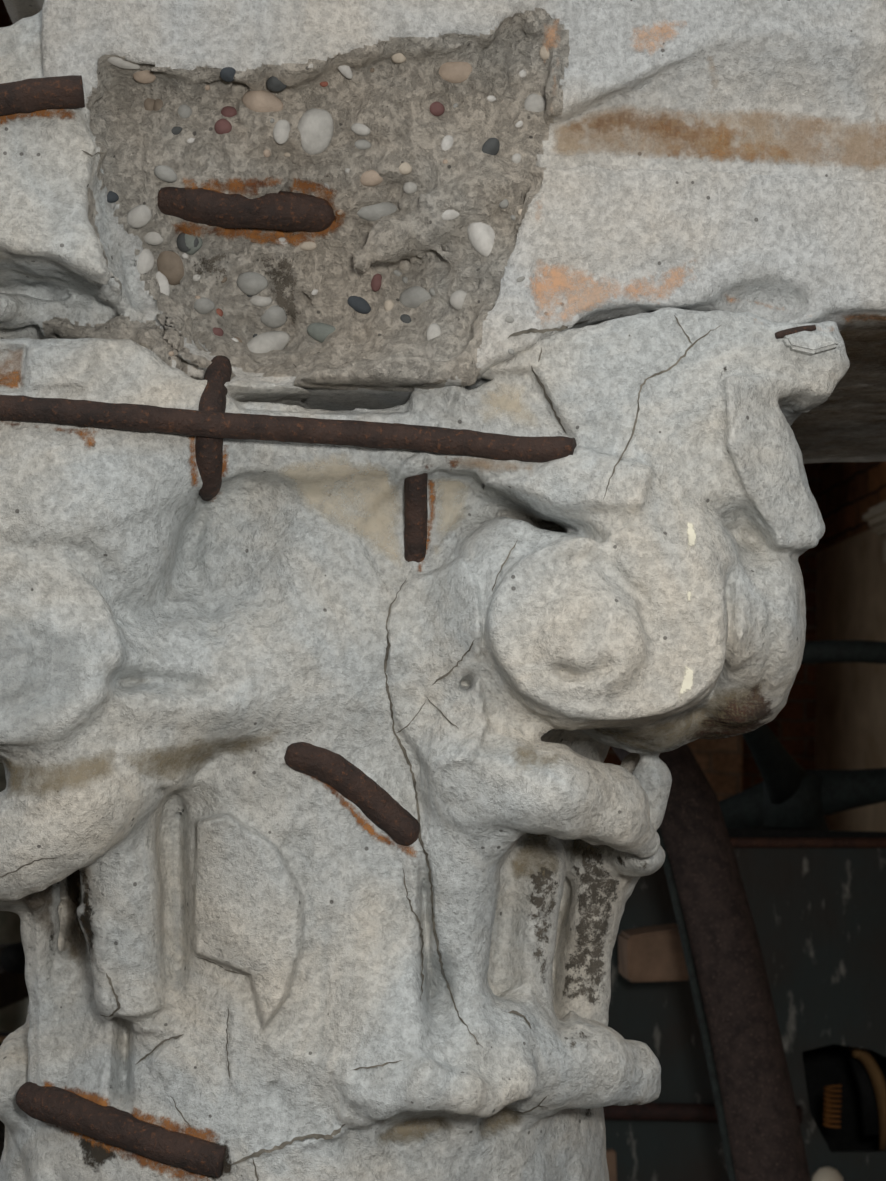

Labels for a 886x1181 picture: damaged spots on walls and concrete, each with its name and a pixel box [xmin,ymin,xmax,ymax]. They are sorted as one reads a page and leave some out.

corrosion [0,108,73,124]
corrosion [175,178,344,245]
spalling [0,8,577,501]
crack [603,315,721,499]
corrosion [311,777,415,855]
crack [384,578,480,1045]
crack [508,1010,531,1029]
crack [354,1060,403,1070]
corrosion [44,1082,108,1106]
corrosion [55,1125,208,1181]
corrosion [132,1108,214,1142]
crack [227,1124,345,1181]